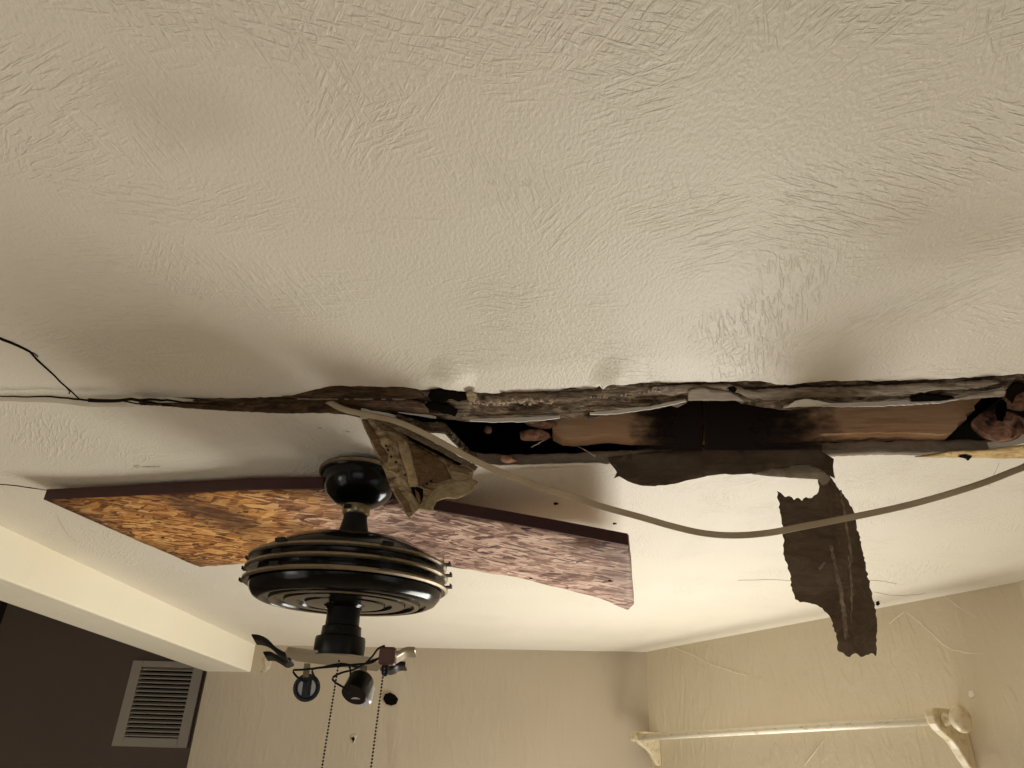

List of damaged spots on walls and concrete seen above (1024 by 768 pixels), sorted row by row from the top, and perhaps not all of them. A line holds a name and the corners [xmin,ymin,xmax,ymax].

crack [0,337,215,407]
damp [643,401,813,450]